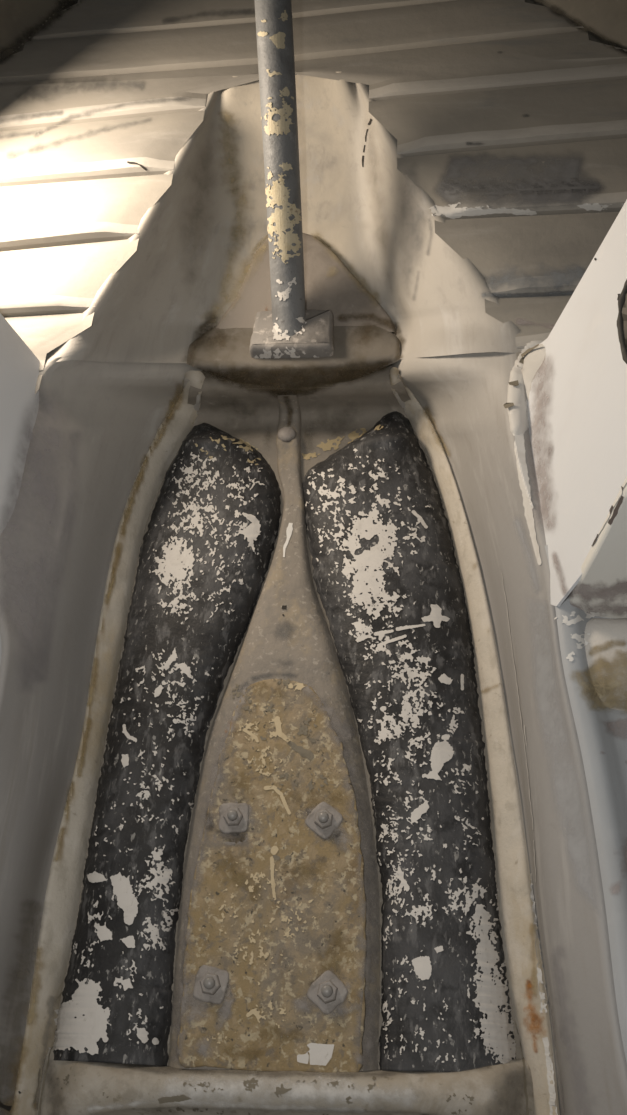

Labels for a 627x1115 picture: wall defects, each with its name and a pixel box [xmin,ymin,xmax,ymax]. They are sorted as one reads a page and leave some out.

peeling [257,10,288,49]
peeling [261,69,295,136]
leakage [437,155,600,204]
peeling [265,162,302,264]
peeling [275,277,297,301]
peeling [254,317,316,359]
peeling [554,611,606,661]